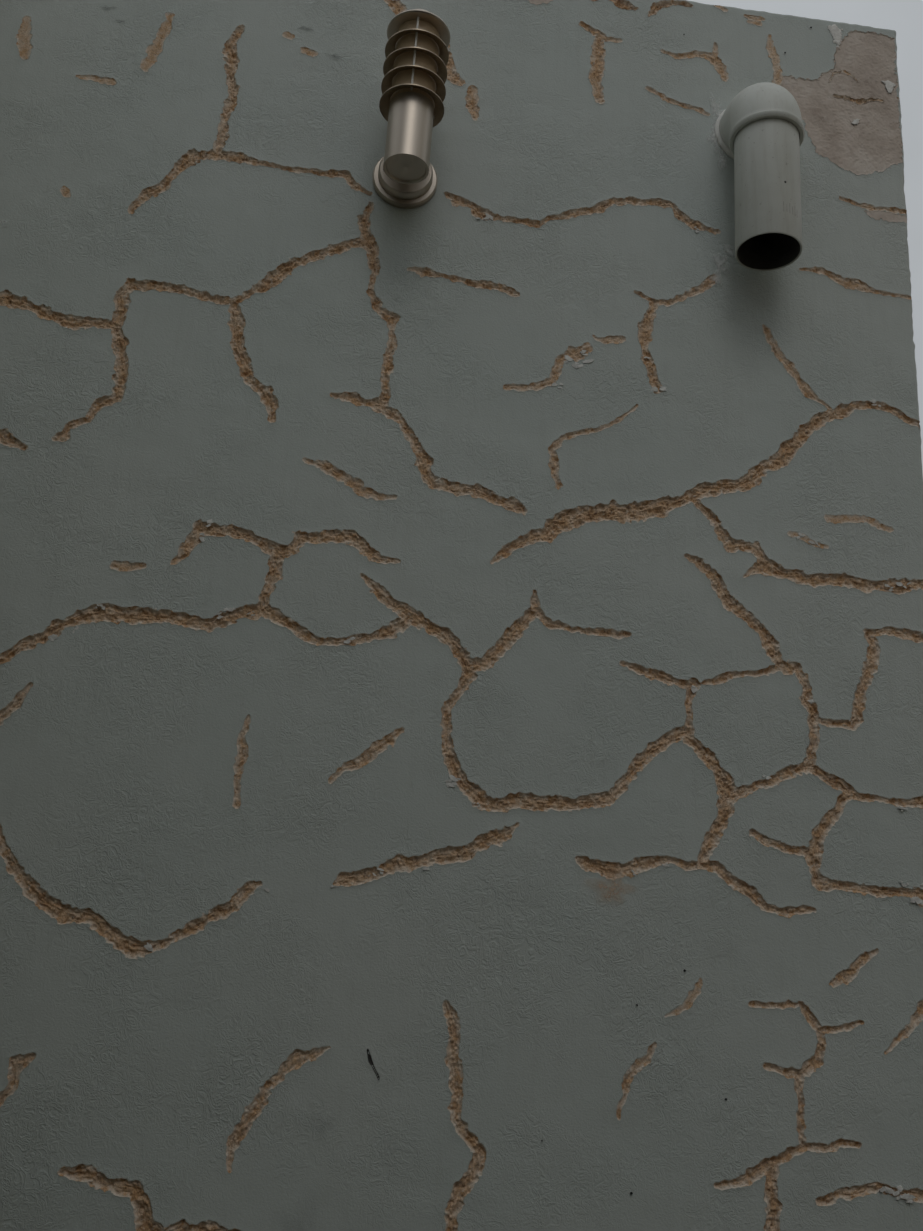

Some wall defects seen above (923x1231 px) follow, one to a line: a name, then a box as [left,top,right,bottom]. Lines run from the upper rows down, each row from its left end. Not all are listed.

peeling [781,24,903,175]
crack [0,21,923,918]
crack [0,824,269,960]
crack [0,1053,36,1107]
crack [226,1046,331,1173]
crack [367,1049,380,1080]
crack [442,1000,486,1231]
crack [714,999,864,1231]
crack [829,948,879,988]
crack [884,1000,923,1055]
crack [57,1164,240,1231]
crack [815,1182,923,1206]